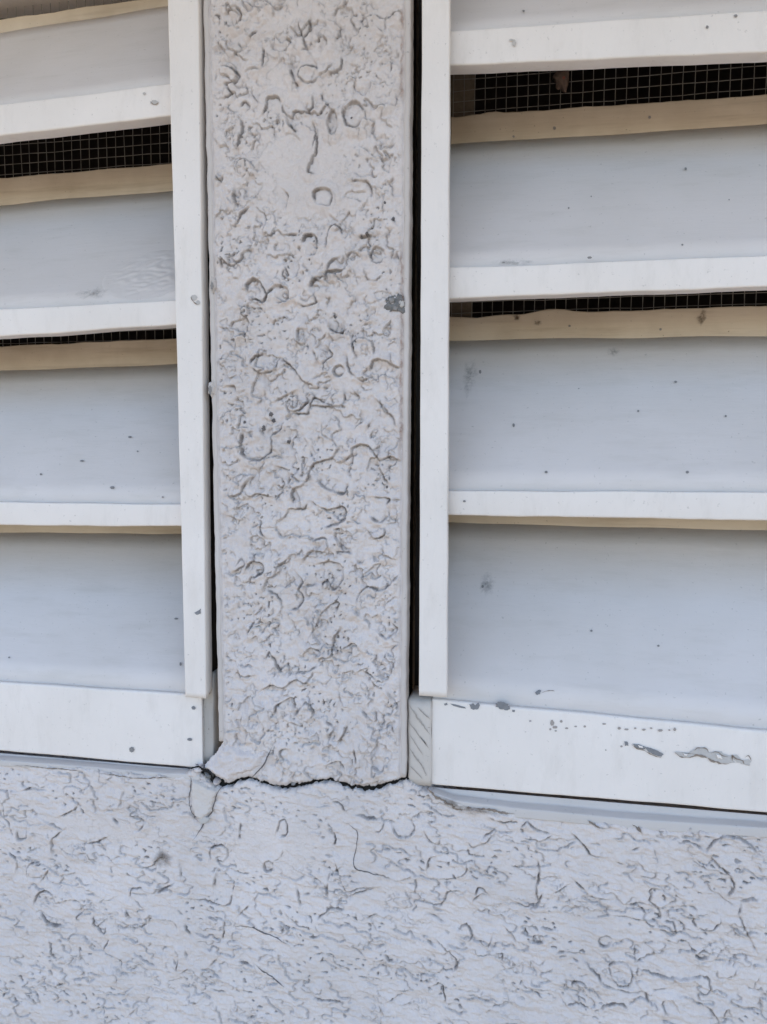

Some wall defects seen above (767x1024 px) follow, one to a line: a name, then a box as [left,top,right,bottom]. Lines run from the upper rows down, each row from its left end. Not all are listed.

crack [188,705,430,841]
peeling [603,723,751,766]